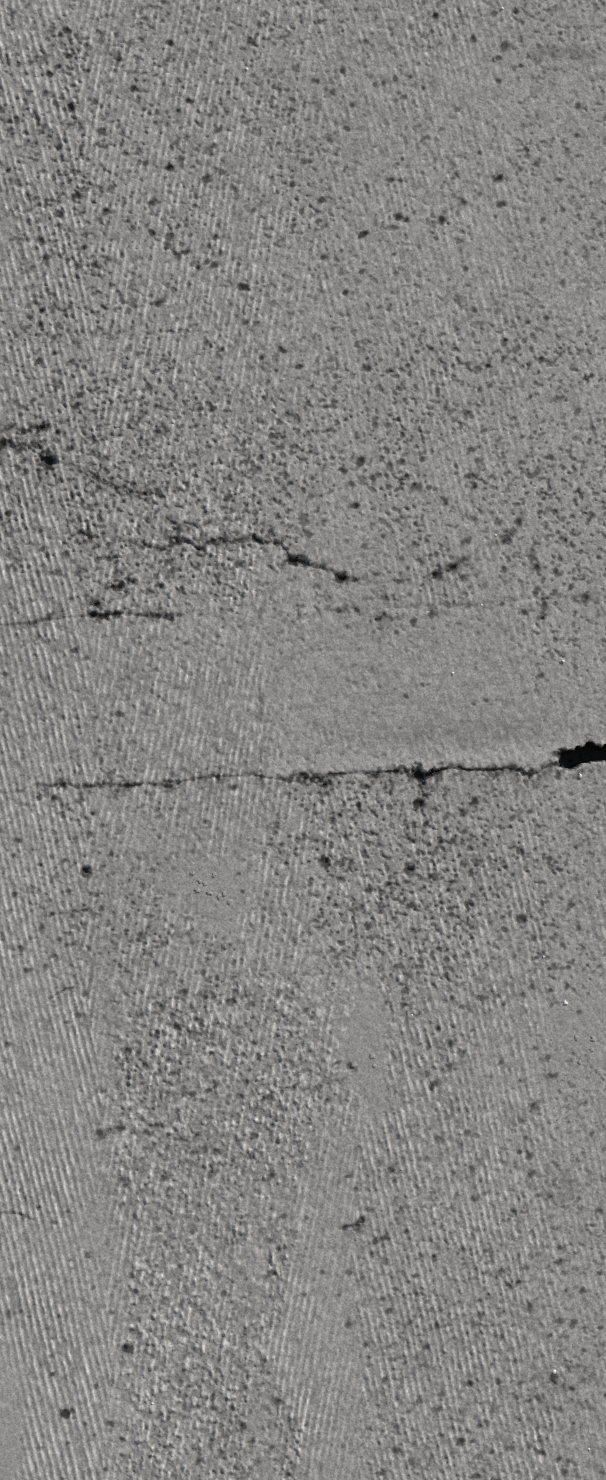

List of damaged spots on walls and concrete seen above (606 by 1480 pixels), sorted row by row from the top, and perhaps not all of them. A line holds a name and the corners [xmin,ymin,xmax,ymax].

spalling [554,742,606,769]
crack [54,762,566,797]